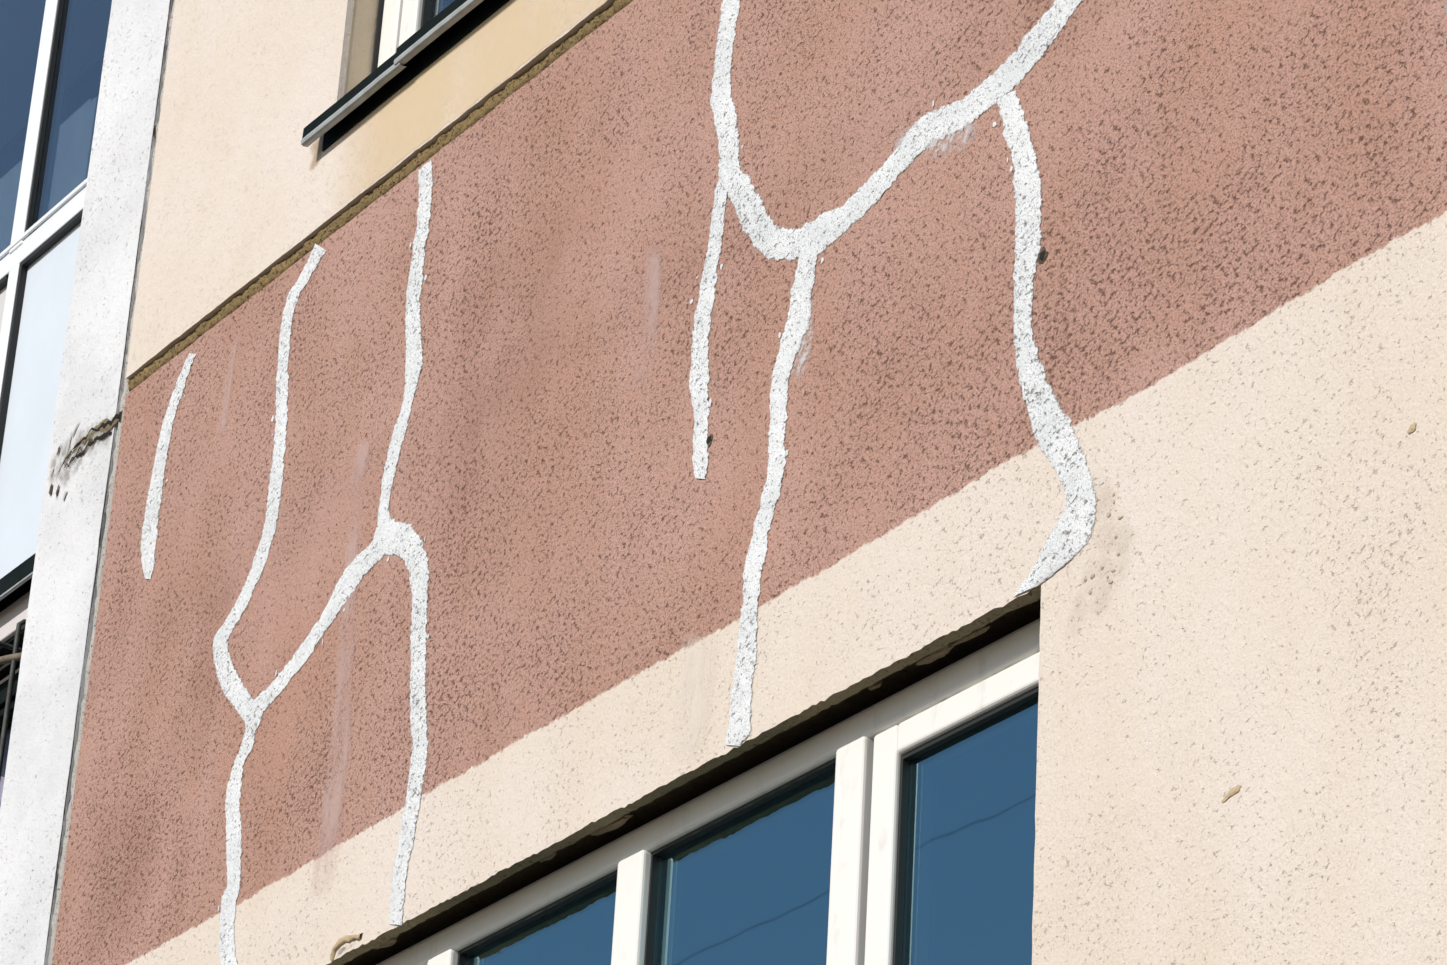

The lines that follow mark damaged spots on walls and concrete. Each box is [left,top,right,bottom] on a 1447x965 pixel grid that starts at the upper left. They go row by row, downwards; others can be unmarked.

crack [45,208,144,955]
crack [151,0,171,148]
crack [140,353,196,579]
crack [213,161,433,965]
crack [689,0,1103,746]